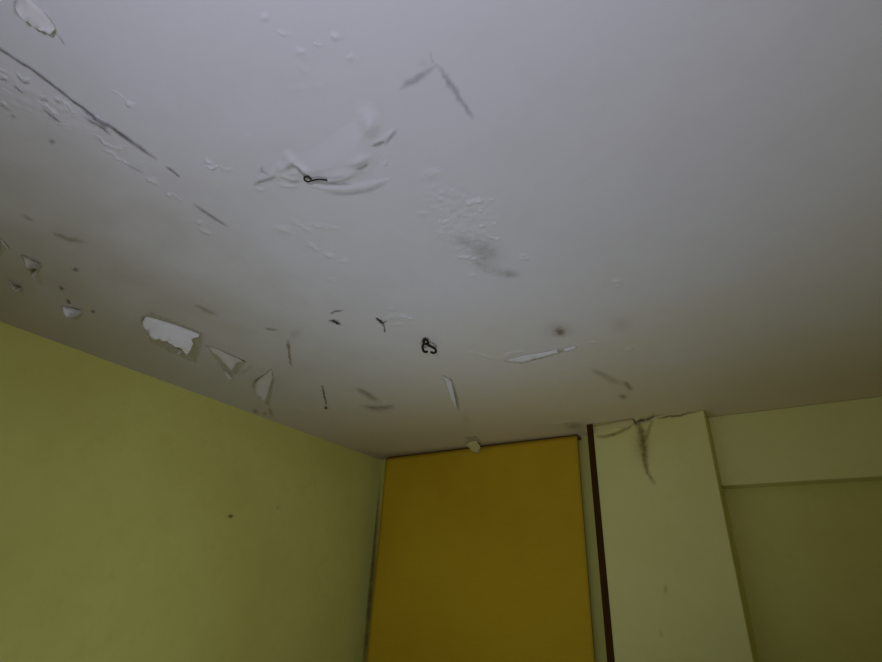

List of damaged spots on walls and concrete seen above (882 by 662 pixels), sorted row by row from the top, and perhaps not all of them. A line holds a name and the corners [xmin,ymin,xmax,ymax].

crack [0,49,144,151]
peeling [142,315,245,379]